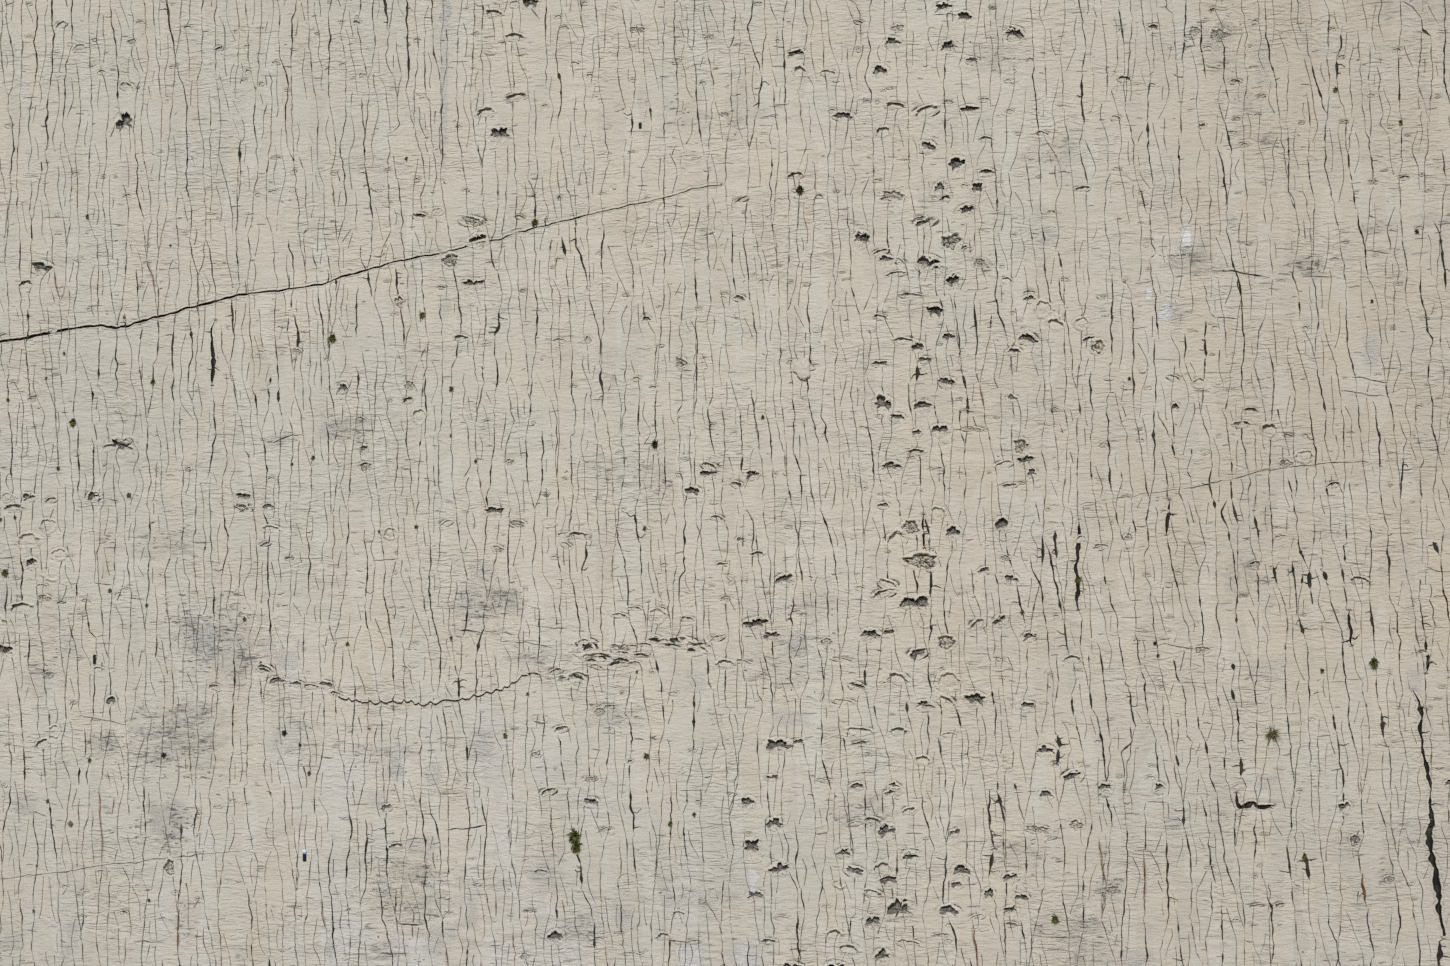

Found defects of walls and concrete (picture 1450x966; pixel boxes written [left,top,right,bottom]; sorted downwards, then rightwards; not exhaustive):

spalling [473,92,530,147]
crack [620,0,665,117]
peeling [830,97,991,140]
spalling [932,0,995,65]
crack [1360,37,1391,179]
crack [504,440,548,521]
crack [900,533,921,594]
spalling [830,518,1008,713]
crack [1213,539,1227,640]
crack [743,835,779,966]
spalling [739,794,793,902]
spalling [814,771,1032,966]